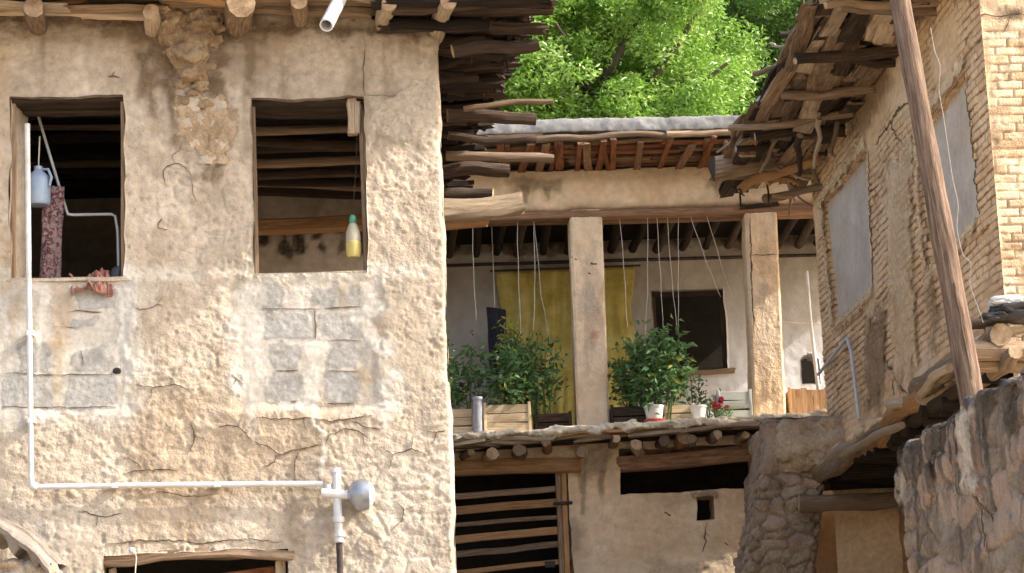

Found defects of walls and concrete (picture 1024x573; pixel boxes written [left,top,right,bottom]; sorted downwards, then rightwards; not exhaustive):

flaking render [172,24,241,166]
crack [163,143,196,199]
crack [868,103,924,284]
crack [124,400,445,506]